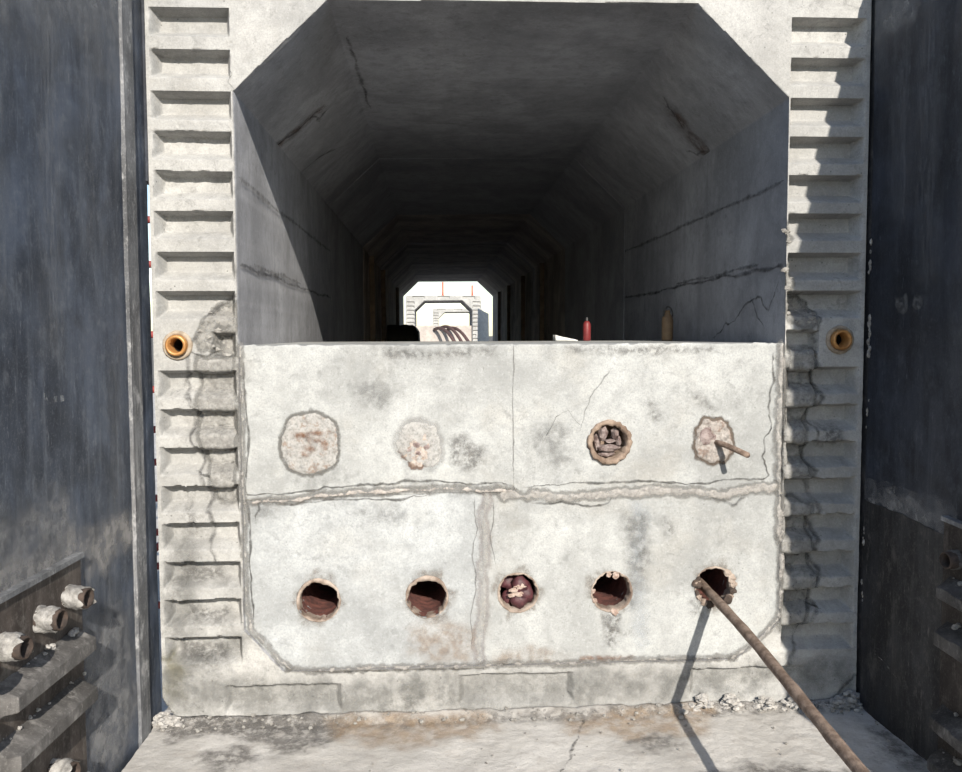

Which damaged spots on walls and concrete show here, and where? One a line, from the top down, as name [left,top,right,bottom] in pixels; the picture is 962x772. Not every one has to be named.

spalling [197,303,237,357]
crack [626,265,780,334]
spalling [781,266,816,328]
crack [188,351,216,477]
spalling [398,434,430,470]
crack [540,357,775,507]
crack [243,362,514,617]